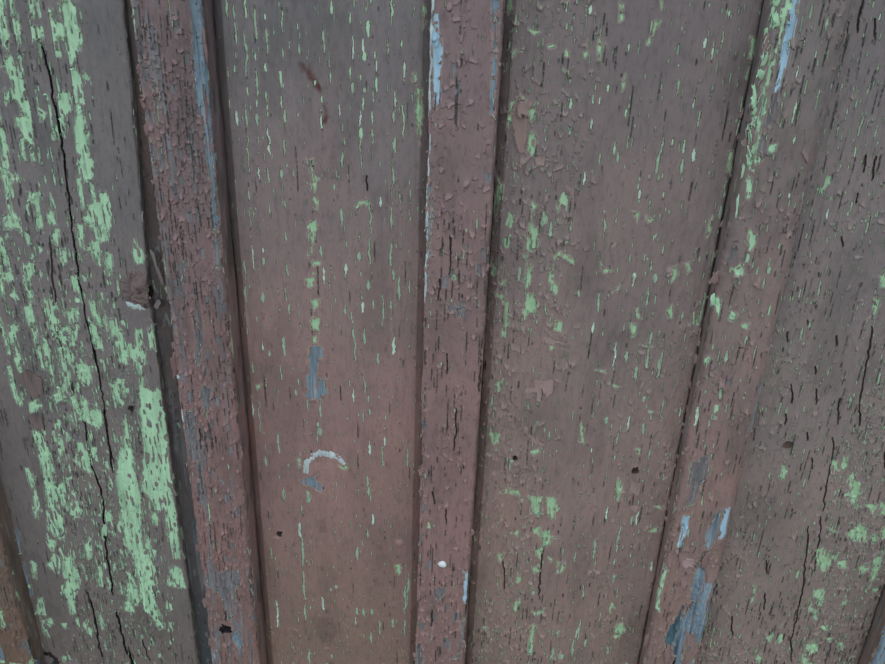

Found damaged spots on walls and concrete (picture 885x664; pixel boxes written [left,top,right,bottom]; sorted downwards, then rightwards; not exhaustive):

peeling [189,0,224,274]
spalling [226,0,288,183]
spalling [349,0,378,168]
peeling [403,0,443,303]
peeling [706,0,805,236]
peeling [0,117,186,638]
crack [40,40,151,664]
peeling [288,299,348,512]
spalling [344,164,410,362]
peeling [495,201,552,353]
peeling [664,506,731,664]
peeling [827,523,885,586]